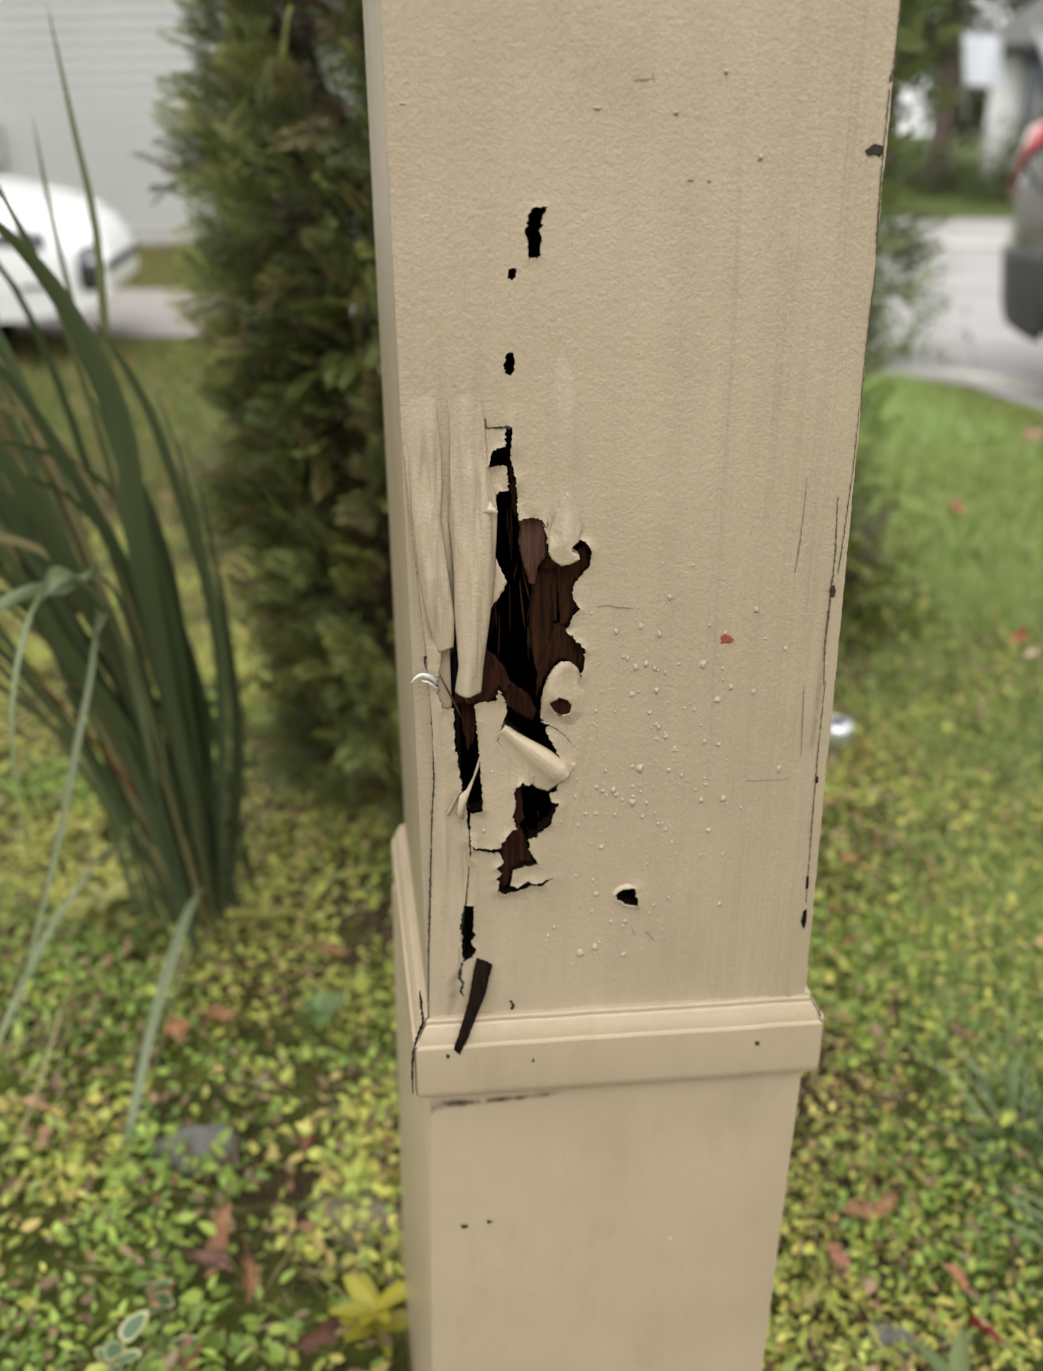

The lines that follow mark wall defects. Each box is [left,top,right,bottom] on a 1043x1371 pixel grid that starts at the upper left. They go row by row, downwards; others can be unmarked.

peeling [404,394,519,730]
peeling [543,492,592,629]
peeling [538,649,586,727]
peeling [457,719,570,893]
crack [411,721,471,1094]
spalling [460,917,476,961]
spalling [613,884,639,908]